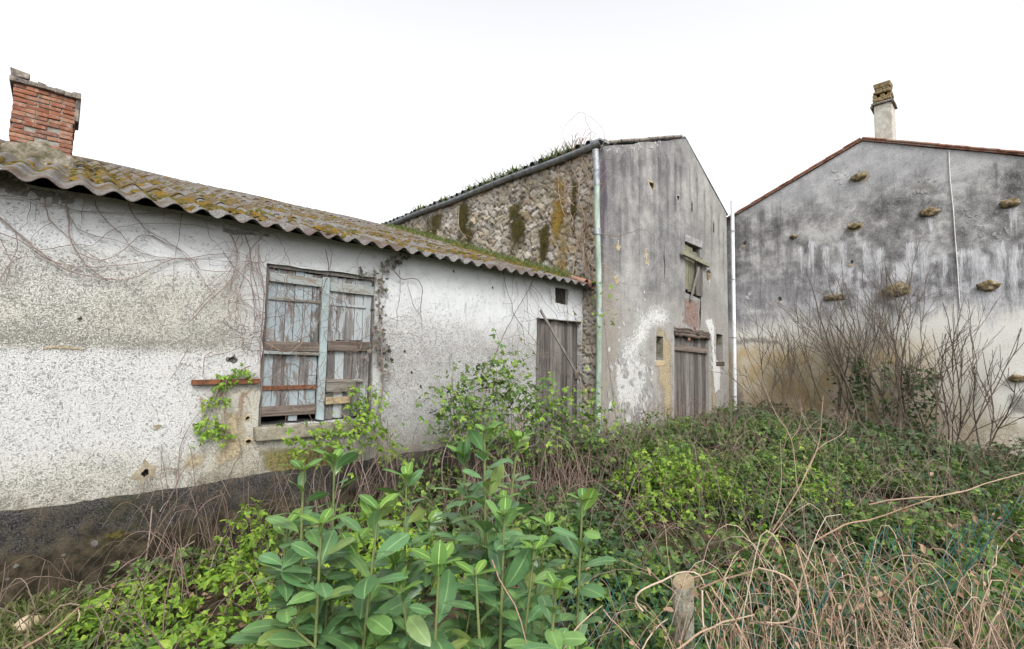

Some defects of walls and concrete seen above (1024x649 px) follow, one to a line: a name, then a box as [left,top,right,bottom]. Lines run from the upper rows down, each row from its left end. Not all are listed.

damp [798,240,847,281]
damp [852,230,883,276]
damp [904,241,929,278]
damp [941,241,1019,323]
peeling [608,291,722,423]
spalling [131,459,158,485]